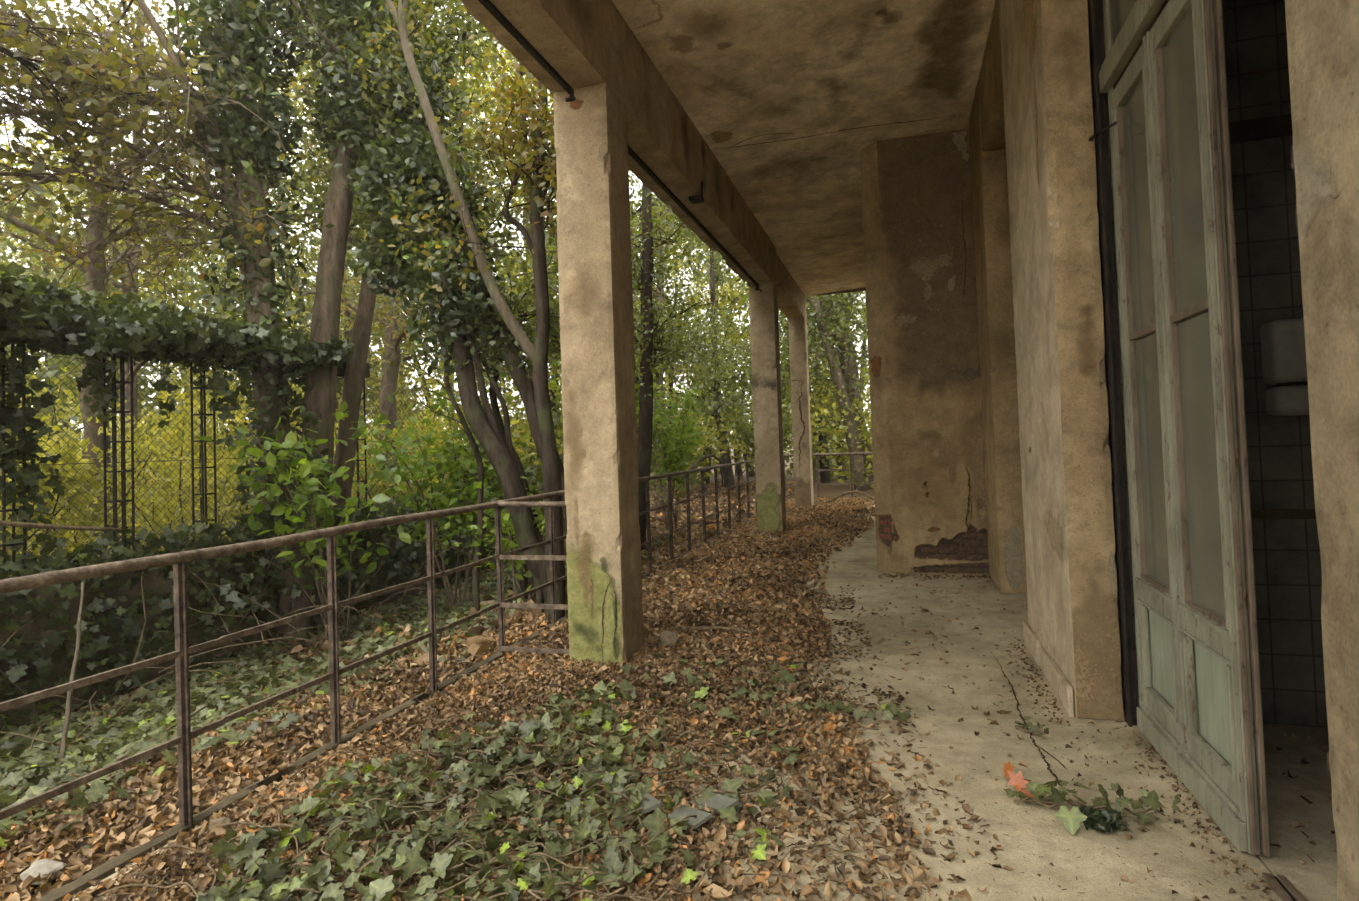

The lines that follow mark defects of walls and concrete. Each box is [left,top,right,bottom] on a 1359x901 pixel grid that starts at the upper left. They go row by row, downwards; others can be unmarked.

crack [965,464,973,530]
flaking render [878,515,900,552]
flaking render [913,525,990,574]
crack [990,651,1074,794]